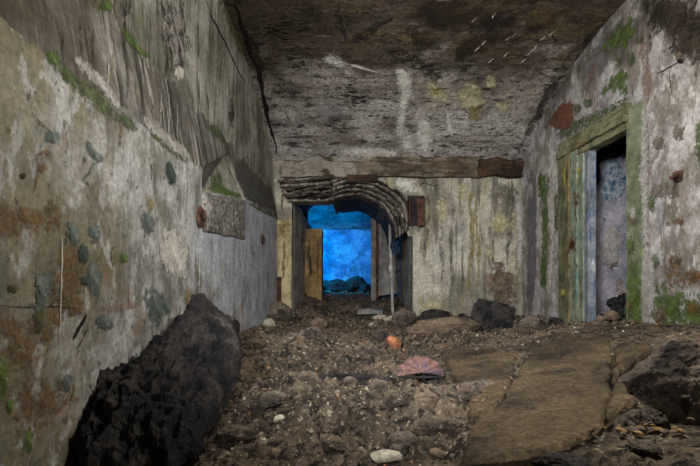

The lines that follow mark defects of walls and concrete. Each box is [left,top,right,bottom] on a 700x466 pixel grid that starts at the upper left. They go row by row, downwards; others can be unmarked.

damp [75,16,129,113]
crack [206,0,277,154]
damp [340,45,443,157]
damp [403,0,557,72]
damp [457,181,481,296]
damp [487,170,537,316]
damp [421,293,446,313]